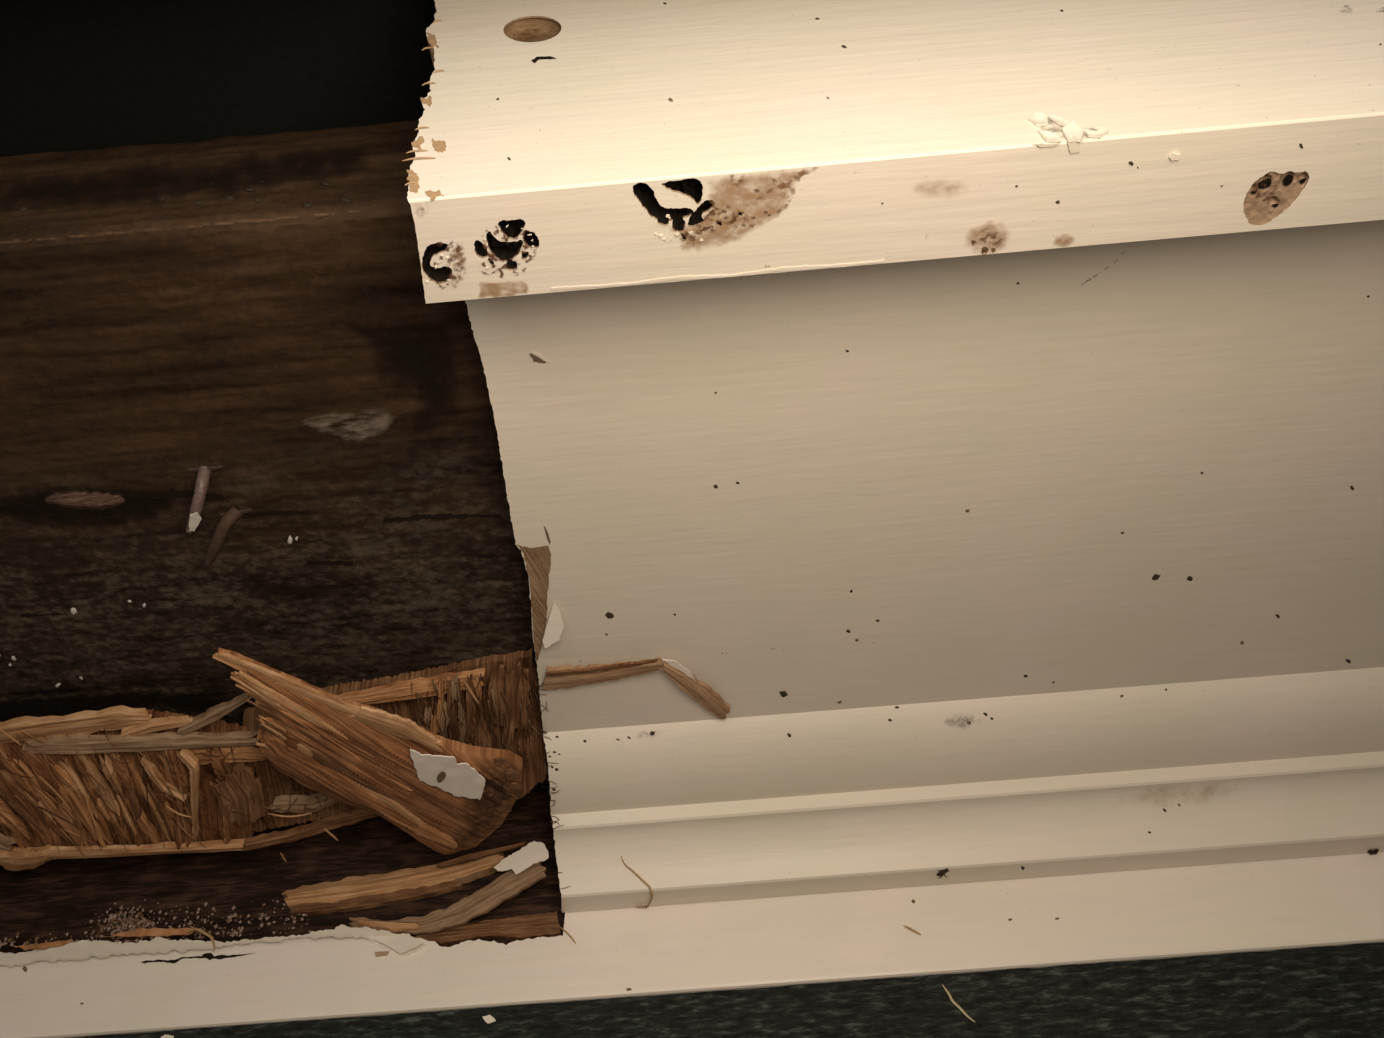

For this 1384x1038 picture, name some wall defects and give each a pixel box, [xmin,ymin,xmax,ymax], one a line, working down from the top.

water stain [759,167,816,213]
spalling [1243,171,1309,224]
water stain [431,242,464,288]
water stain [482,225,535,277]
peeling [517,526,564,661]
peeling [410,749,485,800]
peeling [0,841,549,968]